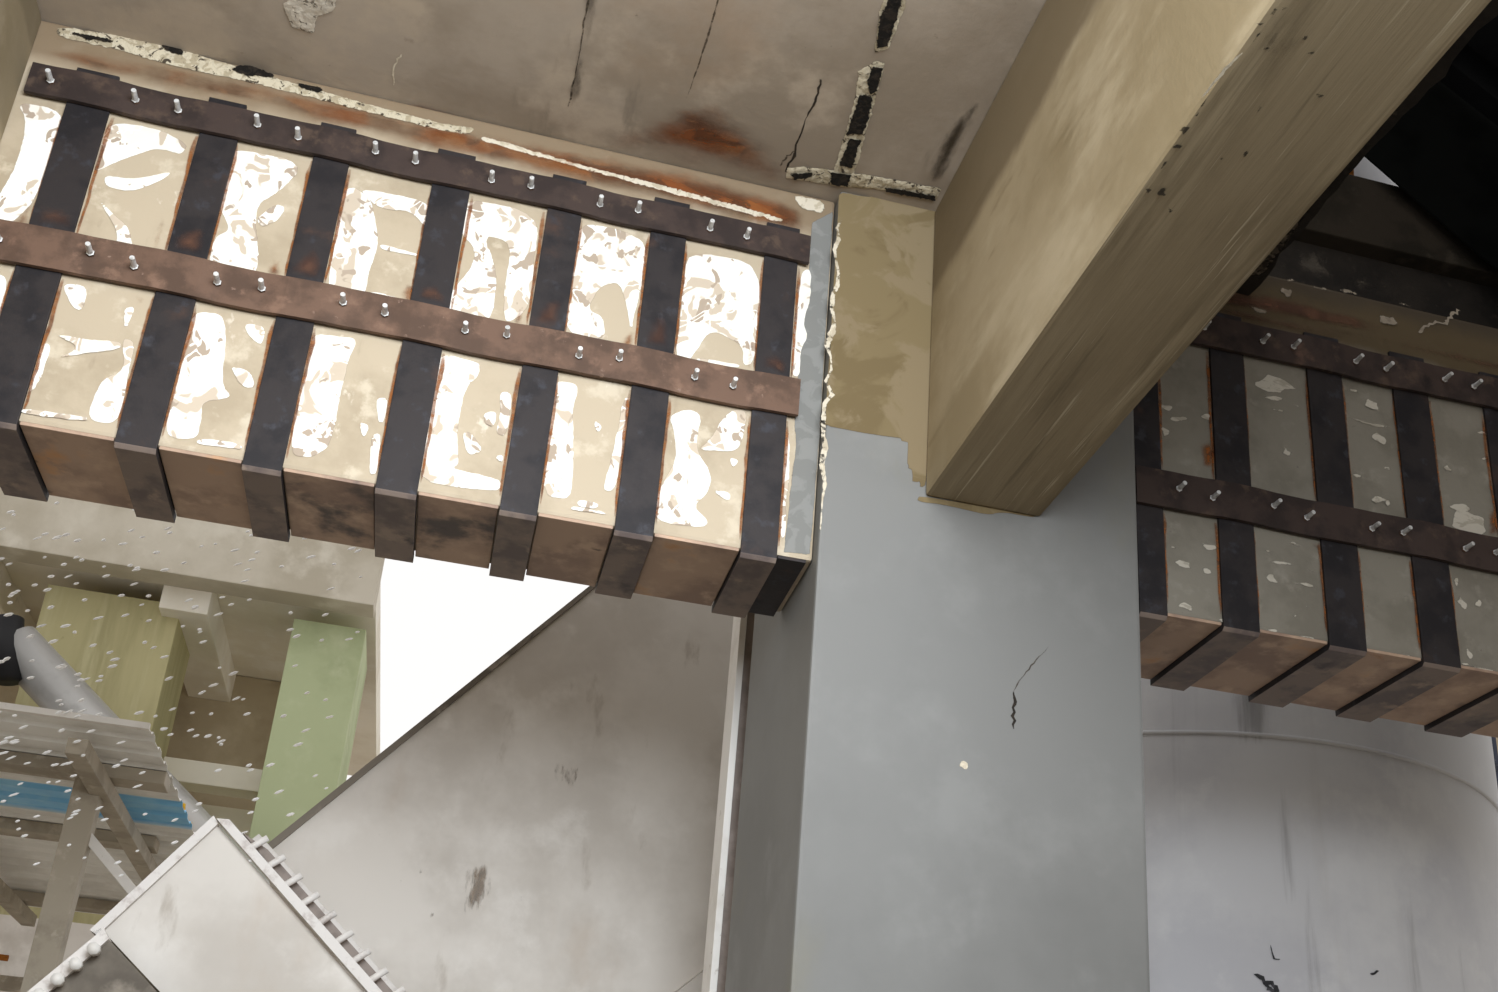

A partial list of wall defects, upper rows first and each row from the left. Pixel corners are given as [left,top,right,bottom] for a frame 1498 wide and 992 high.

crack [570,0,589,99]
crack [690,0,719,89]
rust [664,115,748,156]
crack [780,79,822,172]
peeling [210,151,298,271]
peeling [450,201,538,321]
peeling [567,225,645,338]
peeling [676,254,760,367]
peeling [786,0,1034,530]
peeling [166,312,254,449]
peeling [292,334,356,457]
crack [1011,650,1046,729]